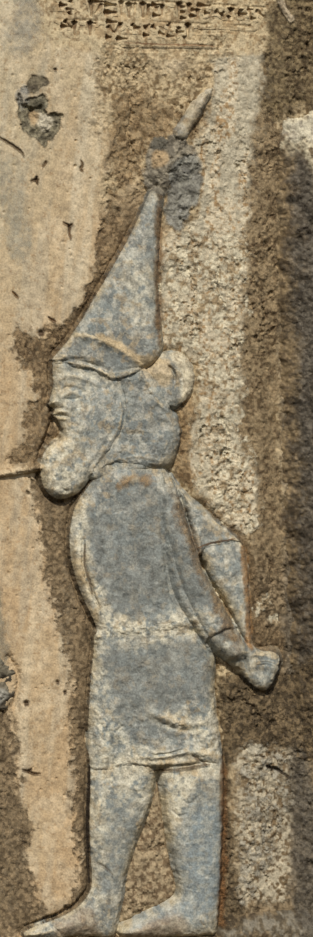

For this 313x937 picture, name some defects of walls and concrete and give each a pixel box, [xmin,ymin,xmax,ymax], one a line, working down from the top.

spalling [17,68,63,147]
crack [198,538,235,548]